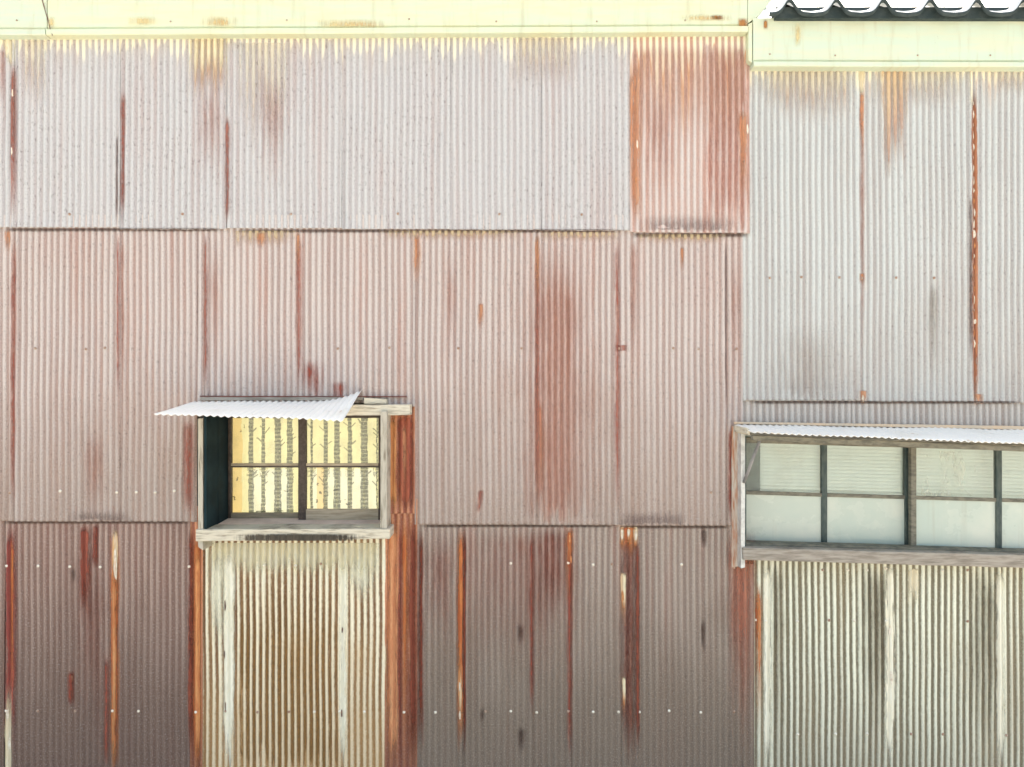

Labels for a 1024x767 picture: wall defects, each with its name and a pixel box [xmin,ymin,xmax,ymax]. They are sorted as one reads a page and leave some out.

corrosion [116,100,125,209]
corrosion [630,67,640,206]
corrosion [709,104,749,213]
corrosion [535,240,562,468]
corrosion [390,416,413,505]
corrosion [5,536,16,767]
corrosion [80,526,98,601]
corrosion [386,528,423,751]
corrosion [457,538,466,741]
corrosion [529,532,572,733]
corrosion [729,552,752,672]